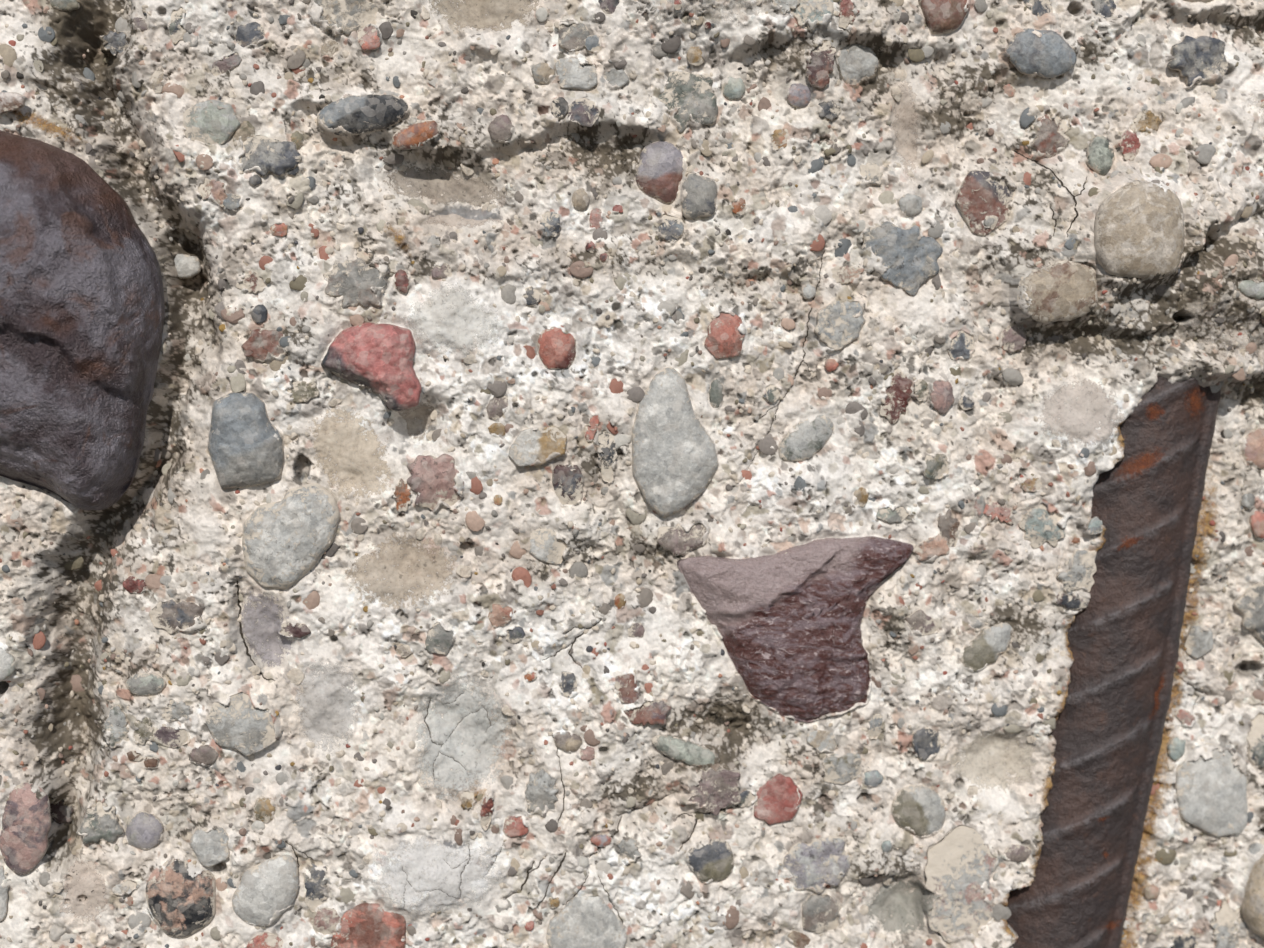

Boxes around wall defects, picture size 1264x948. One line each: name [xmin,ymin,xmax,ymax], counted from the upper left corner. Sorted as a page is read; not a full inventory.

corrosion [1179,488,1216,651]
crack [424,692,491,780]
spalling [951,728,1036,795]
spalling [1006,375,1221,948]
corrosion [1128,671,1182,910]
corrosion [1106,920,1137,948]